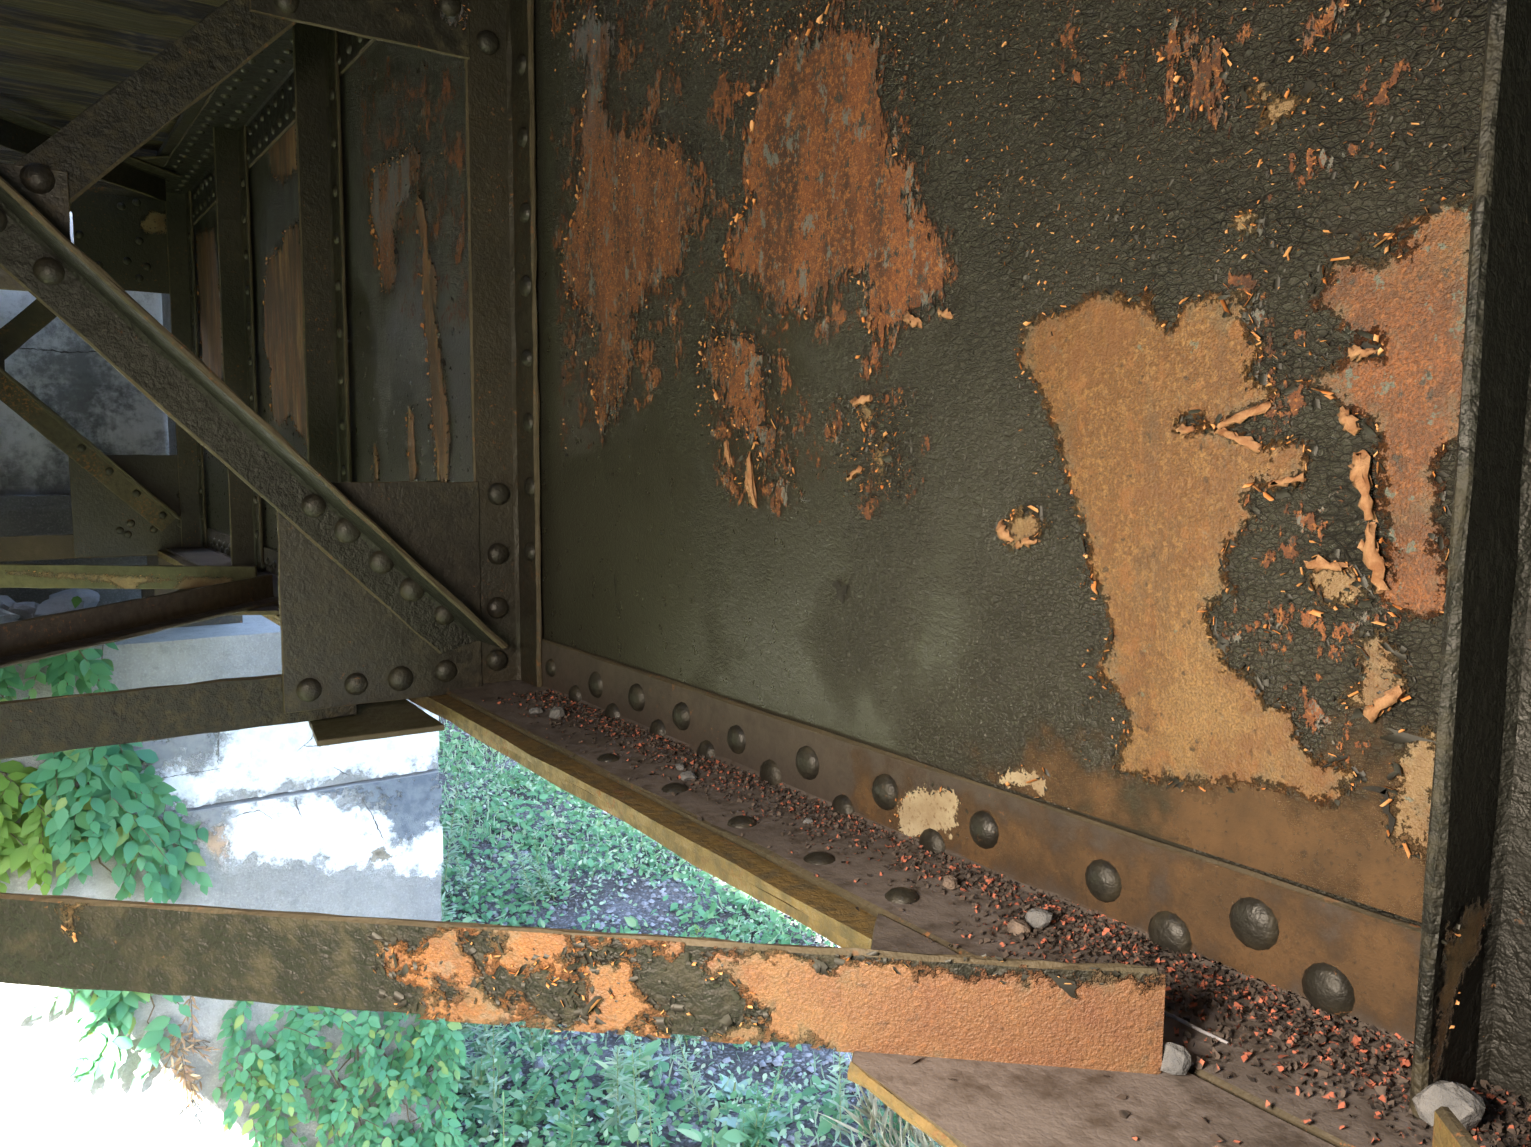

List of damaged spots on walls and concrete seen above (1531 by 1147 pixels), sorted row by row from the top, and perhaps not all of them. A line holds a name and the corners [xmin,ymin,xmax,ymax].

rust [405,185,451,482]
peeling [549,0,1478,864]
peeling [365,932,450,1019]
peeling [511,946,752,1036]